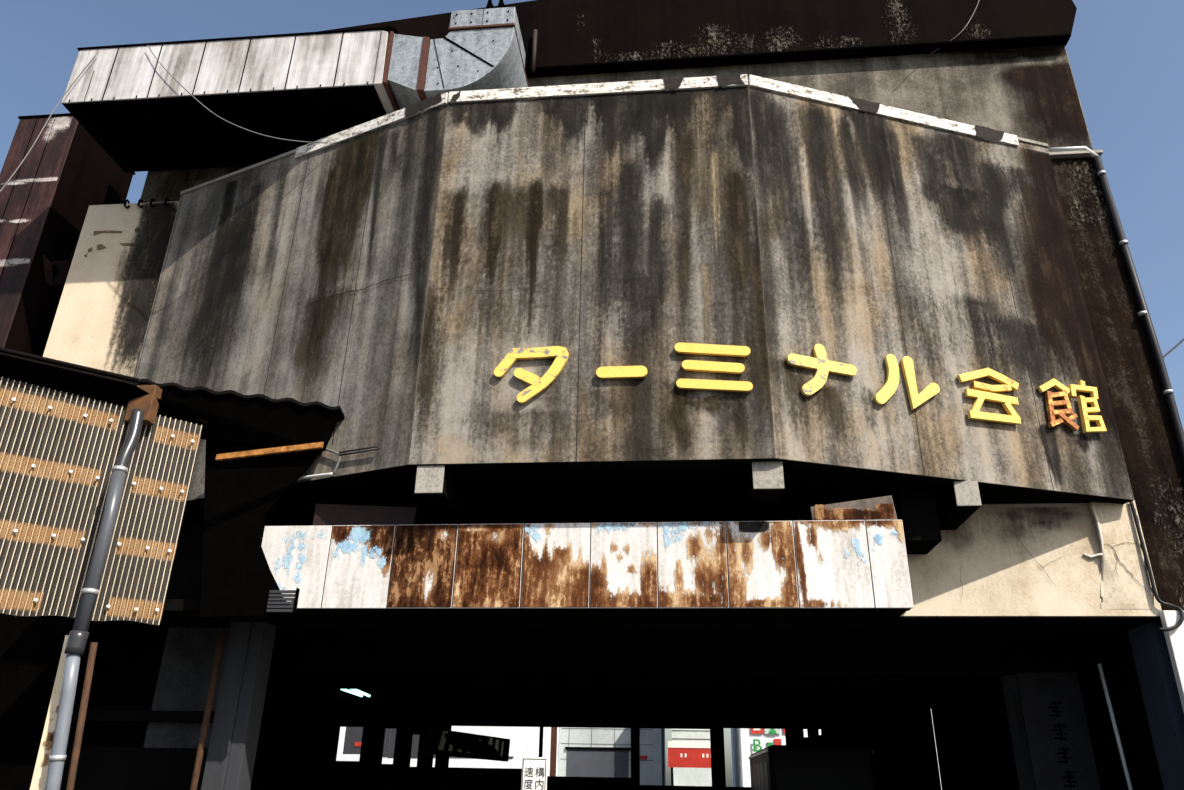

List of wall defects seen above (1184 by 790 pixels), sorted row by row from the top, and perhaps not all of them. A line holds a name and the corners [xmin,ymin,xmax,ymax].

leakage [108,168,208,375]
leakage [183,166,285,387]
leakage [290,100,576,437]
leakage [538,86,910,447]
leakage [909,46,1132,492]
peeling [525,524,543,542]
peeling [596,523,635,533]
rust [332,504,904,607]
crack [1108,509,1154,605]